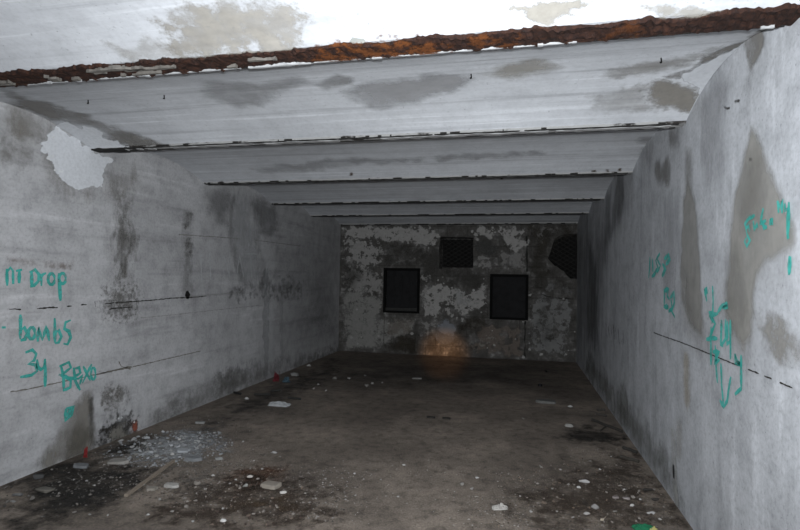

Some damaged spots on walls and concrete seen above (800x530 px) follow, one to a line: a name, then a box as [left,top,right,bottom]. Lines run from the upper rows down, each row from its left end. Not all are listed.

damp [155,3,307,58]
corrosion [312,35,451,62]
corrosion [470,34,518,48]
damp [701,42,744,64]
damp [356,76,464,104]
damp [650,71,699,112]
peeling [40,121,129,190]
peeling [341,225,488,349]
peeling [471,225,530,253]
peeling [528,234,576,356]
damp [681,185,702,334]
damp [726,129,793,344]